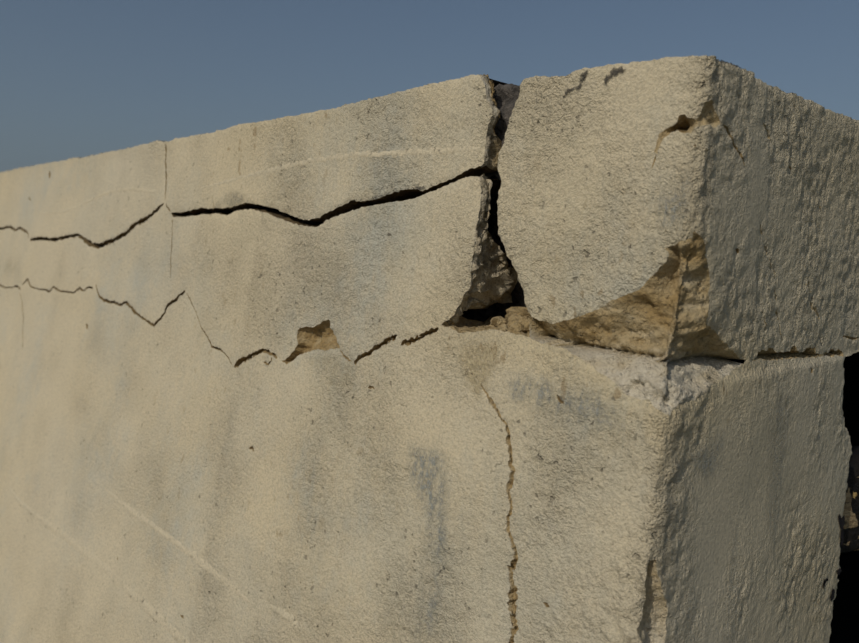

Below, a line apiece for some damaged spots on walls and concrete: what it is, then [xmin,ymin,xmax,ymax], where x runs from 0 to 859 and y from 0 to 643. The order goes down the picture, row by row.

crack [723,125,745,166]
crack [0,74,530,368]
spalling [282,319,340,365]
spalling [529,230,744,415]
crack [461,359,519,643]
peeling [838,487,859,551]
spalling [637,560,668,643]